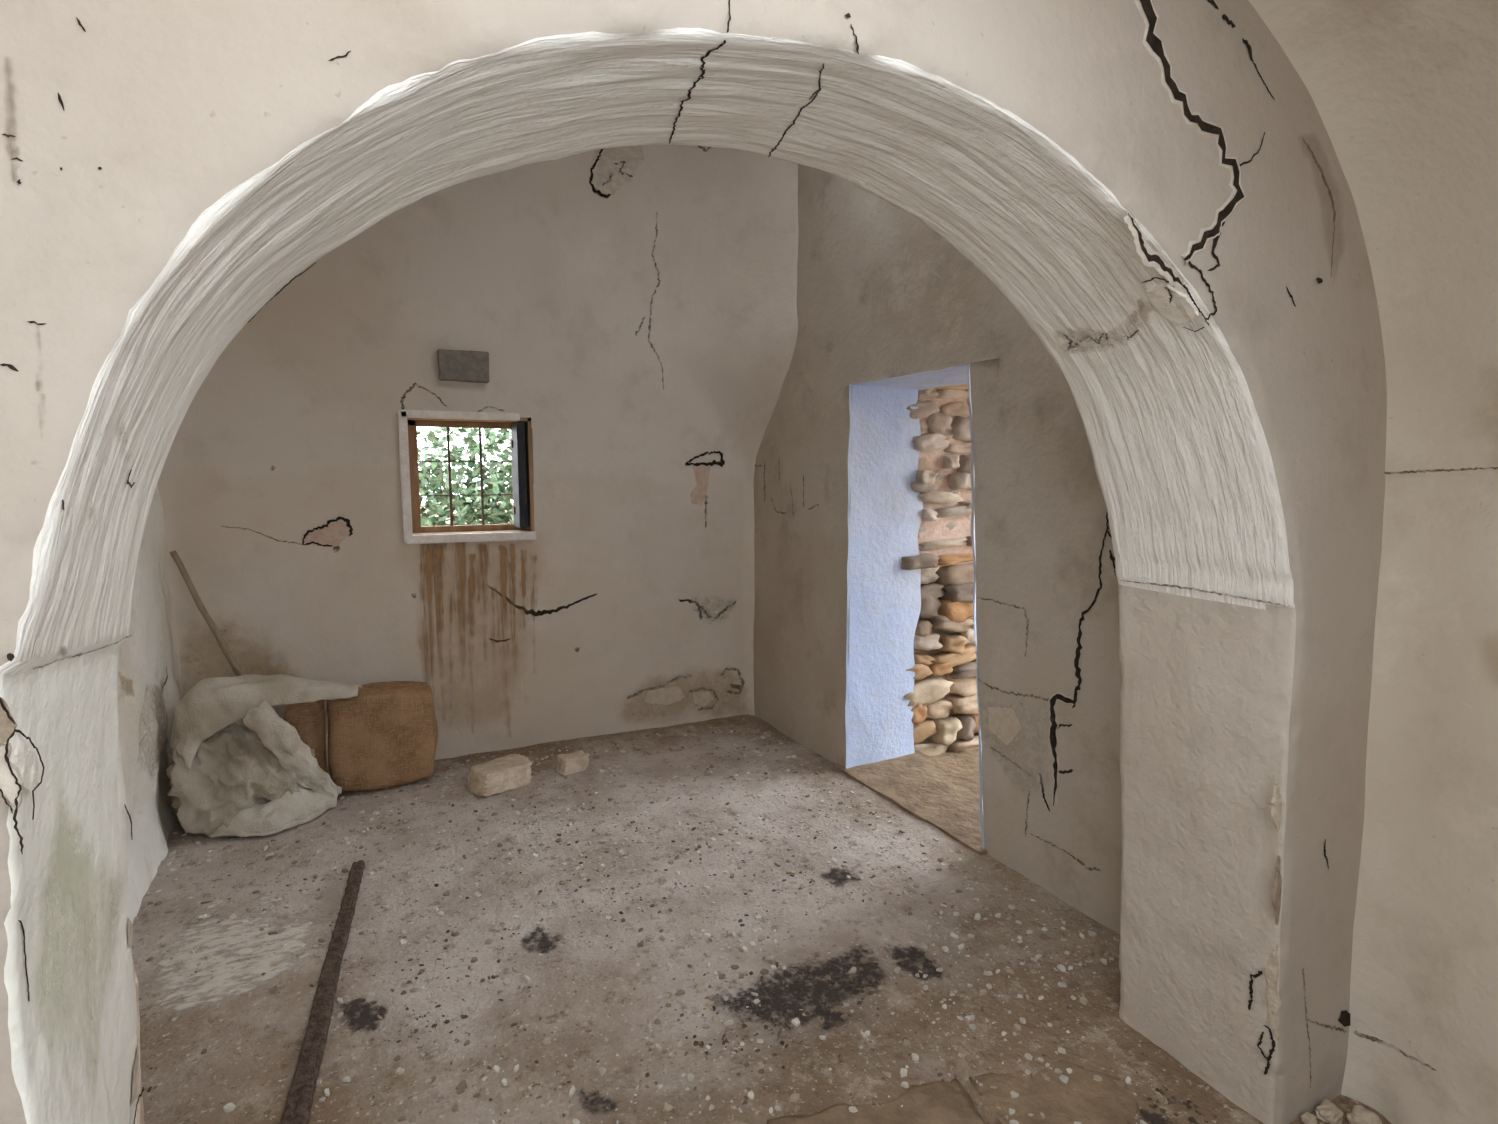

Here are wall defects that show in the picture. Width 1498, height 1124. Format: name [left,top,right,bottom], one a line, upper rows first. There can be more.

crack [669,0,731,152]
crack [768,25,859,157]
peeling [589,146,644,198]
crack [1124,0,1275,326]
crack [1304,142,1336,277]
crack [635,214,664,390]
peeling [1063,333,1108,350]
peeling [1126,284,1204,340]
peeling [223,517,353,550]
crack [488,586,597,643]
crack [978,512,1280,812]
spalling [0,697,44,855]